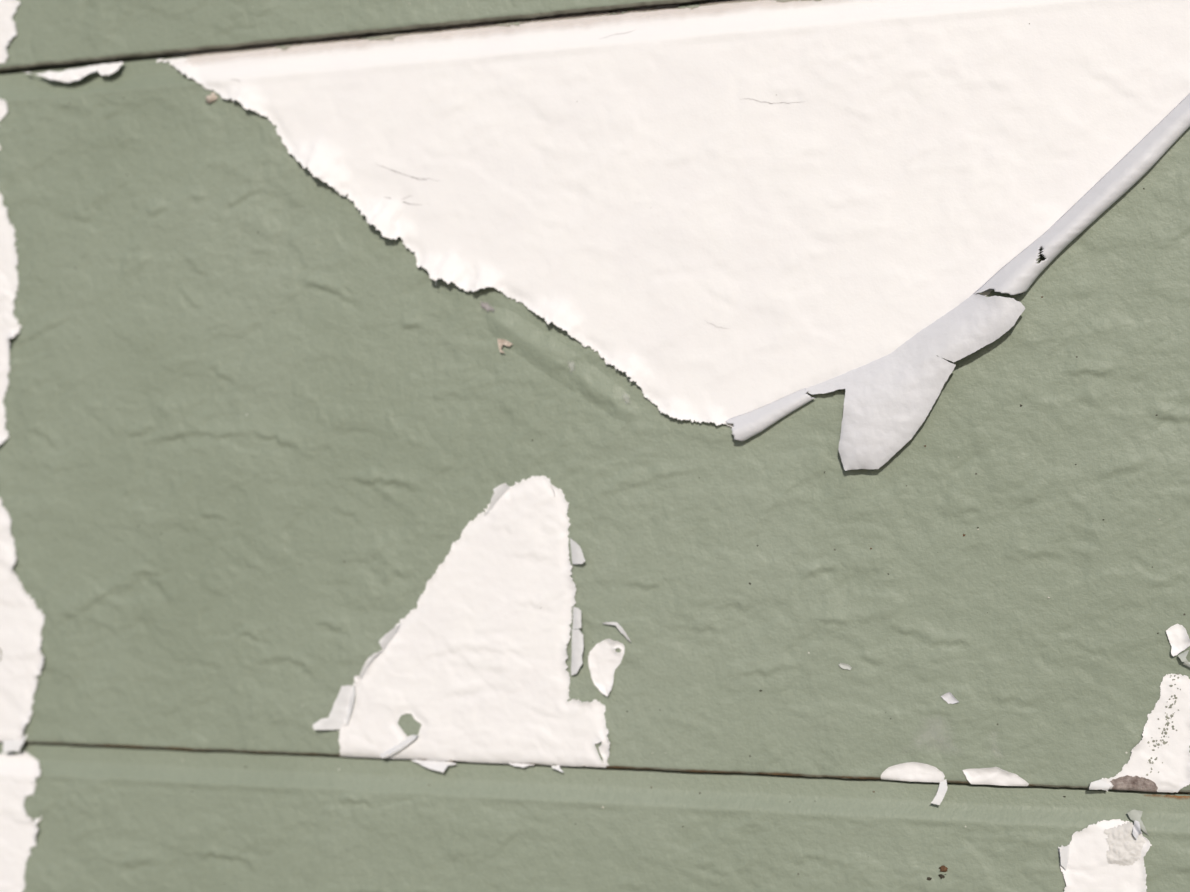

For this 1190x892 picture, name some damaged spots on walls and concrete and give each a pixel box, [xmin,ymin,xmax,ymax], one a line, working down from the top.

peeling [0,99,8,121]
peeling [0,0,20,64]
peeling [0,193,22,445]
peeling [157,0,1190,471]
peeling [0,498,46,892]
peeling [313,476,631,773]
peeling [881,762,948,805]
peeling [962,767,1029,786]
peeling [1058,809,1152,892]
peeling [1089,624,1190,793]